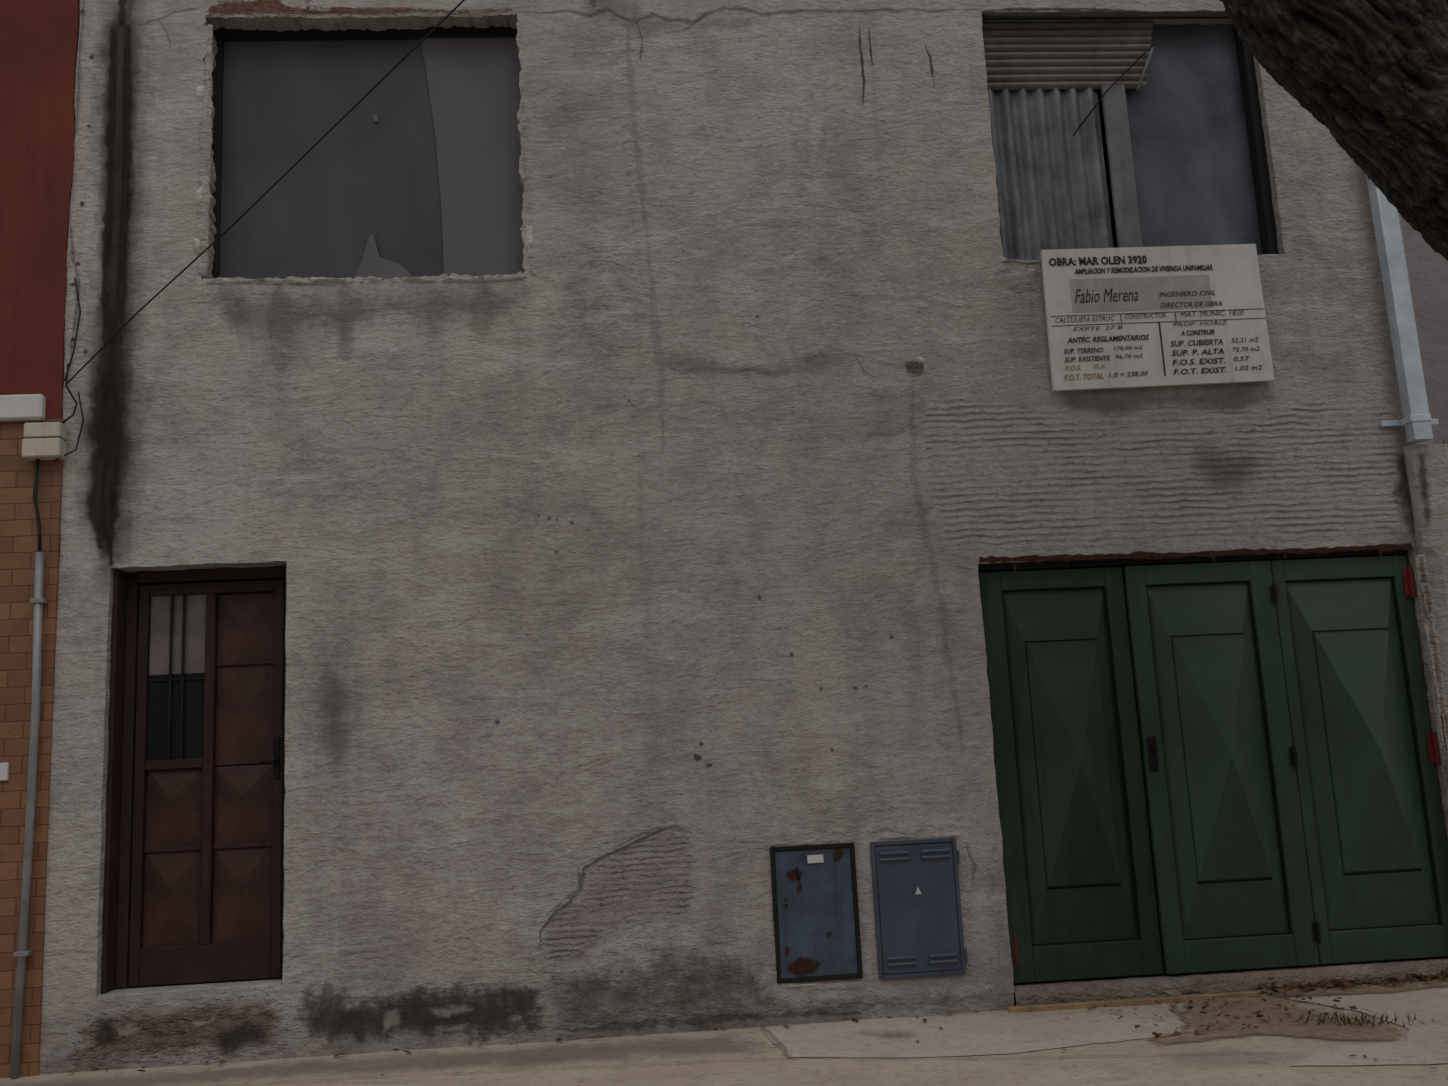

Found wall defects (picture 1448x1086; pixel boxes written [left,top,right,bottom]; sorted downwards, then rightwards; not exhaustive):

crack [859,24,873,102]
crack [925,45,934,84]
spalling [194,0,536,286]
damp [89,0,135,566]
peeling [529,818,699,972]
damp [301,985,861,1041]